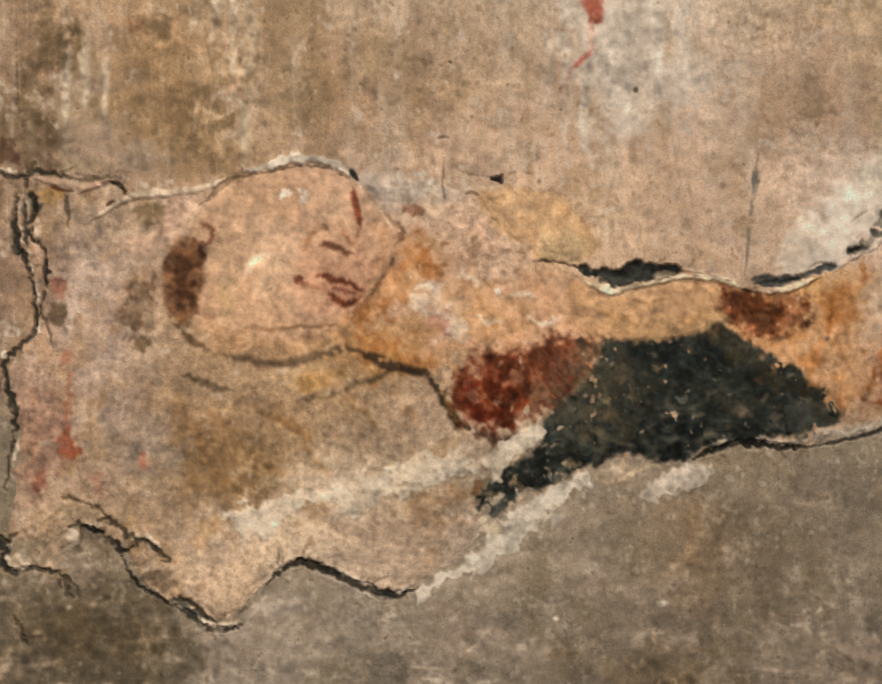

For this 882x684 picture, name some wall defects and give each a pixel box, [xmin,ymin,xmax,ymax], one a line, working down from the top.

crack [195,162,351,211]
crack [0,159,144,492]
crack [532,257,582,270]
crack [806,261,831,271]
crack [692,425,882,468]
crack [0,494,419,647]
damp [0,552,443,684]
damp [416,484,882,684]